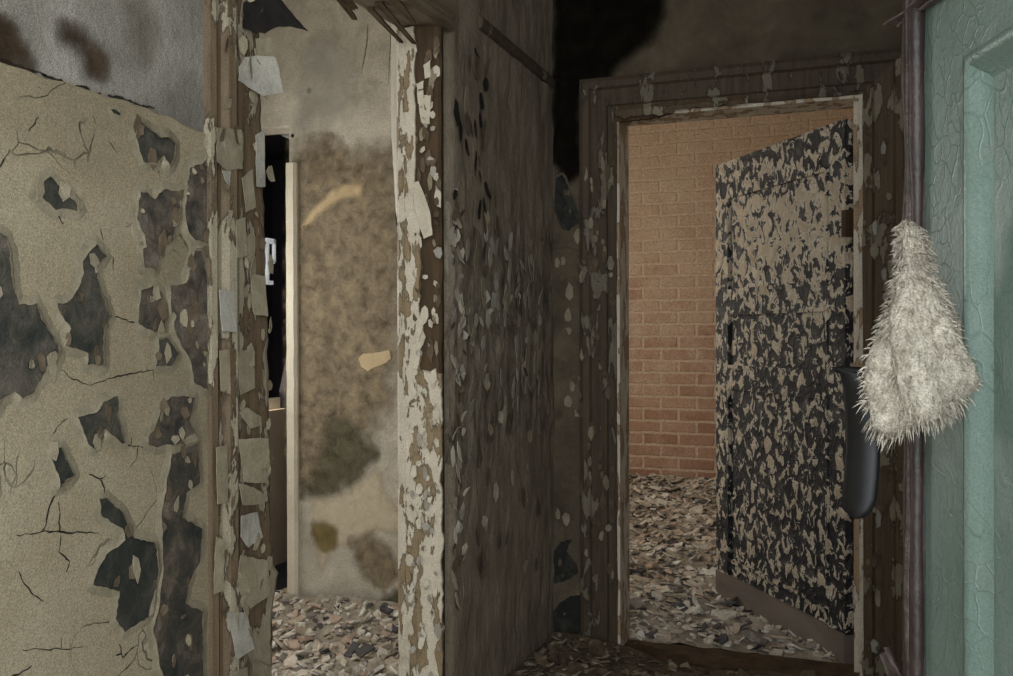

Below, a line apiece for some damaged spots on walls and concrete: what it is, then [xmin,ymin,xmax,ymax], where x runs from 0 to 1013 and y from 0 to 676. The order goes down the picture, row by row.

leakage [0,14,34,69]
leakage [60,20,108,79]
peeling [224,0,308,103]
leakage [554,76,579,182]
peeling [28,167,87,221]
peeling [0,223,116,418]
crack [62,369,154,385]
leakage [296,135,398,603]
peeling [402,36,615,634]
peeling [41,389,129,498]
crack [17,496,96,572]
crack [12,637,80,676]